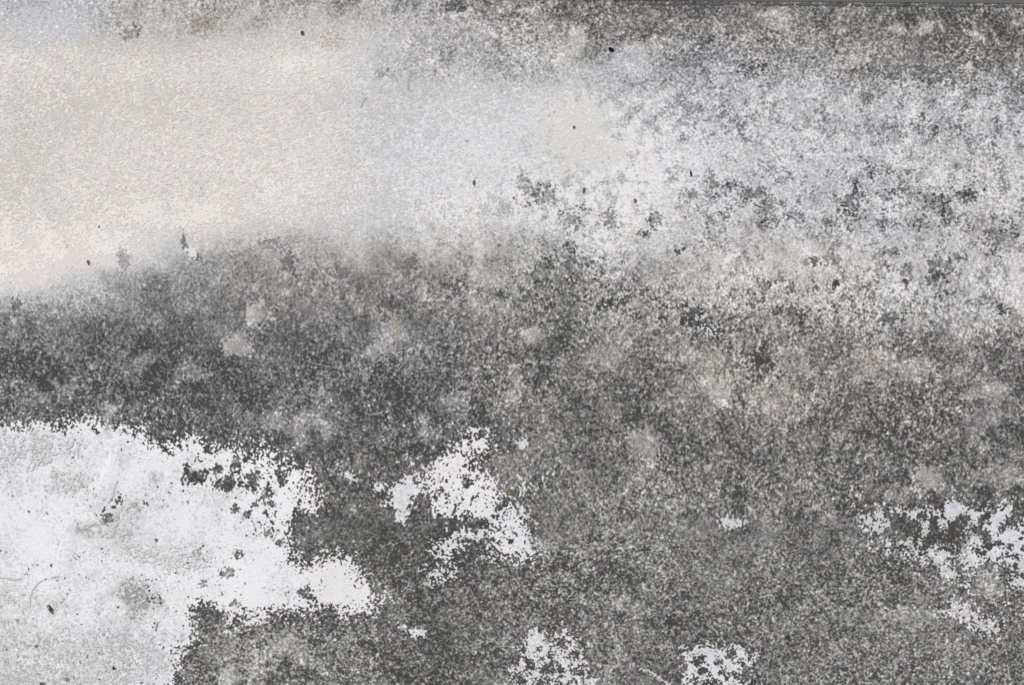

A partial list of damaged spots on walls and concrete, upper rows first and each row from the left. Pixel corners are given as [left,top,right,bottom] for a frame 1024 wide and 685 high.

damp [75,501,224,575]
mould [941,526,969,556]
damp [0,577,184,685]